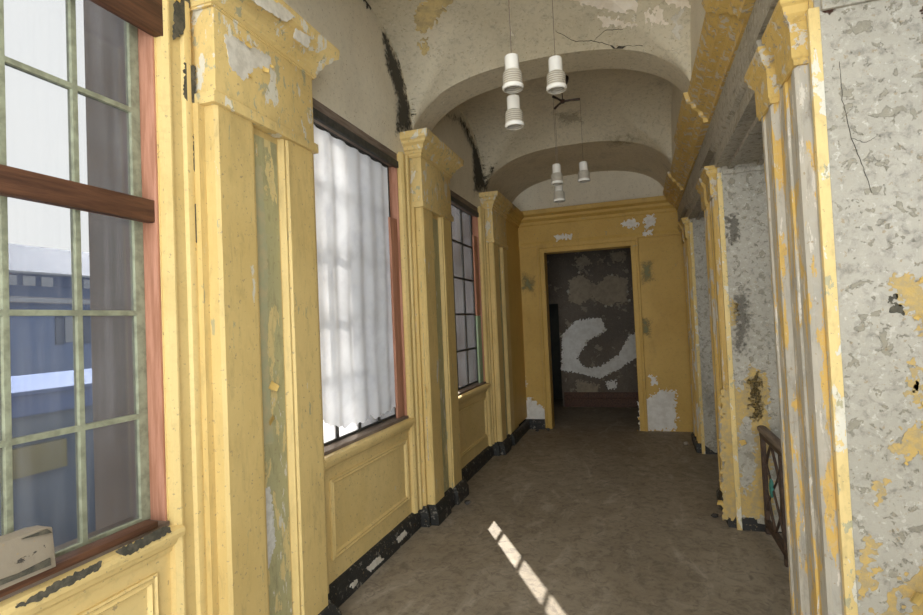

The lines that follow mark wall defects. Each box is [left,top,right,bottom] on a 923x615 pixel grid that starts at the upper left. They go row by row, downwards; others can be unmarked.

peeling [172,0,190,40]
peeling [252,0,311,48]
peeling [574,0,691,29]
peeling [224,34,273,81]
peeling [183,62,197,103]
peeling [888,272,923,337]
flaking render [637,374,680,431]
peeling [903,357,923,409]
peeling [717,364,776,521]
peeling [116,526,172,556]
peeling [15,561,102,608]
peeling [855,534,923,615]